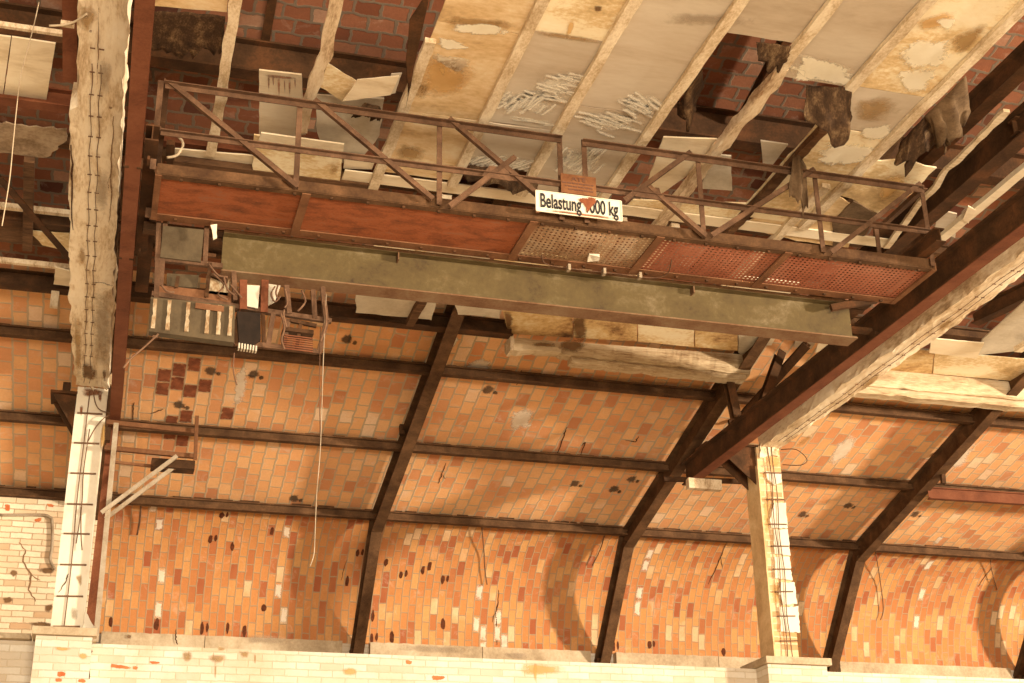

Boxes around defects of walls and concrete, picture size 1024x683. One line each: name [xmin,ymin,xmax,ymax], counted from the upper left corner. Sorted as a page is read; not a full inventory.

leakage [922,14,949,28]
leakage [956,29,982,50]
crack [20,543,68,602]
flaking render [83,611,94,628]